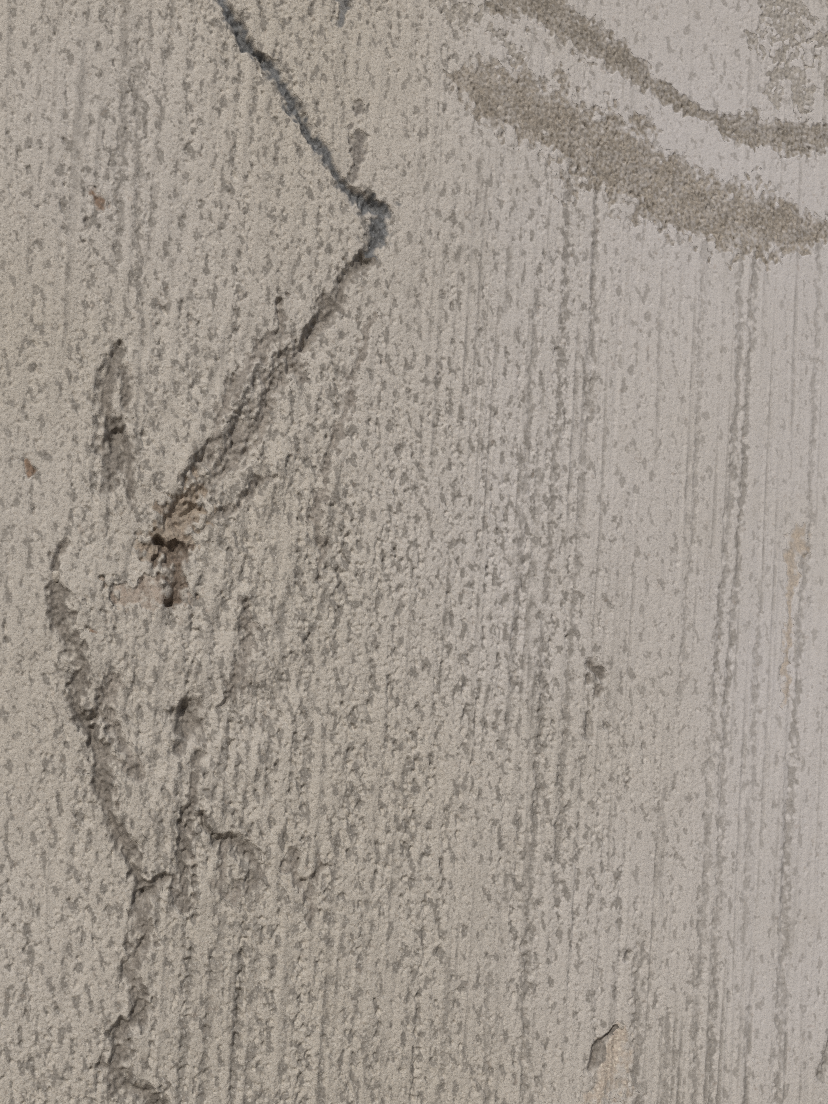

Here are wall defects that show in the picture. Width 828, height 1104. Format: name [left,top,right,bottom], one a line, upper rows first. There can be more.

crack [87,339,148,511]
crack [176,0,403,586]
crack [45,534,336,1104]